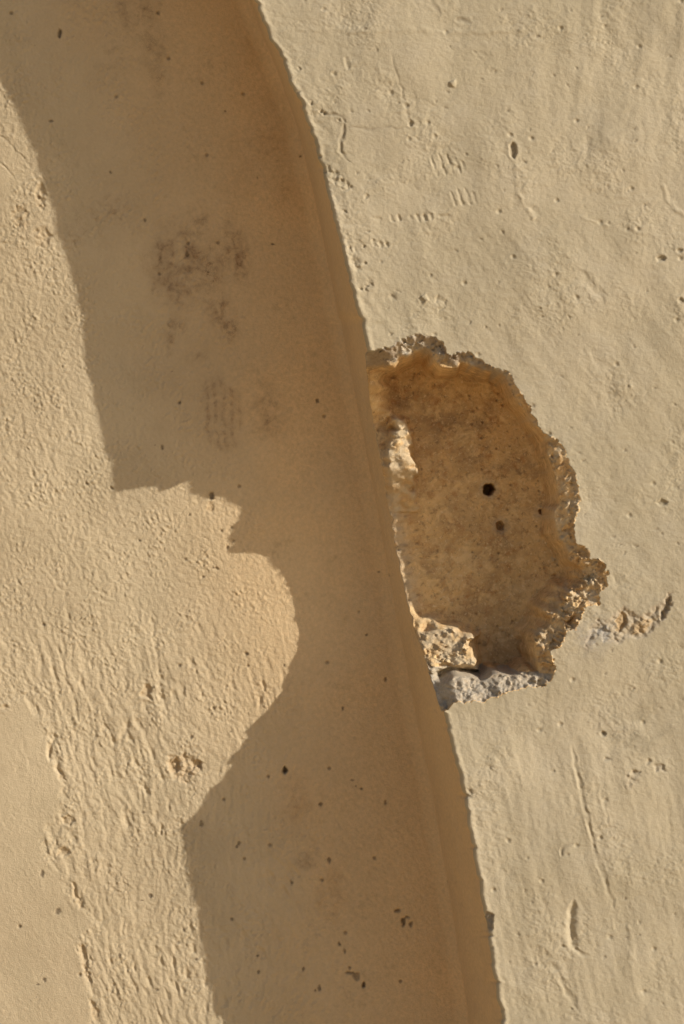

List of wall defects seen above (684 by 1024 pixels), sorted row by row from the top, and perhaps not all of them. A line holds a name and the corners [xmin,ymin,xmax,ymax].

spalling [365,335,676,713]